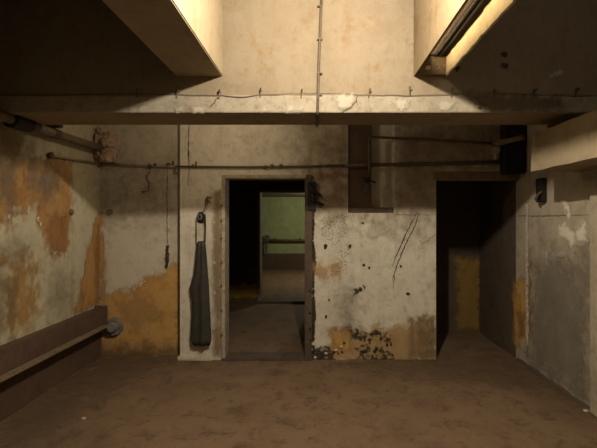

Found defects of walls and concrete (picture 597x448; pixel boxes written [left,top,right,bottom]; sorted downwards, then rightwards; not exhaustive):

peeling [336,94,355,109]
peeling [0,158,72,257]
peeling [101,245,180,357]
spalling [312,212,394,360]
crack [391,211,419,287]
corrosion [512,251,532,353]
peeling [558,199,589,248]